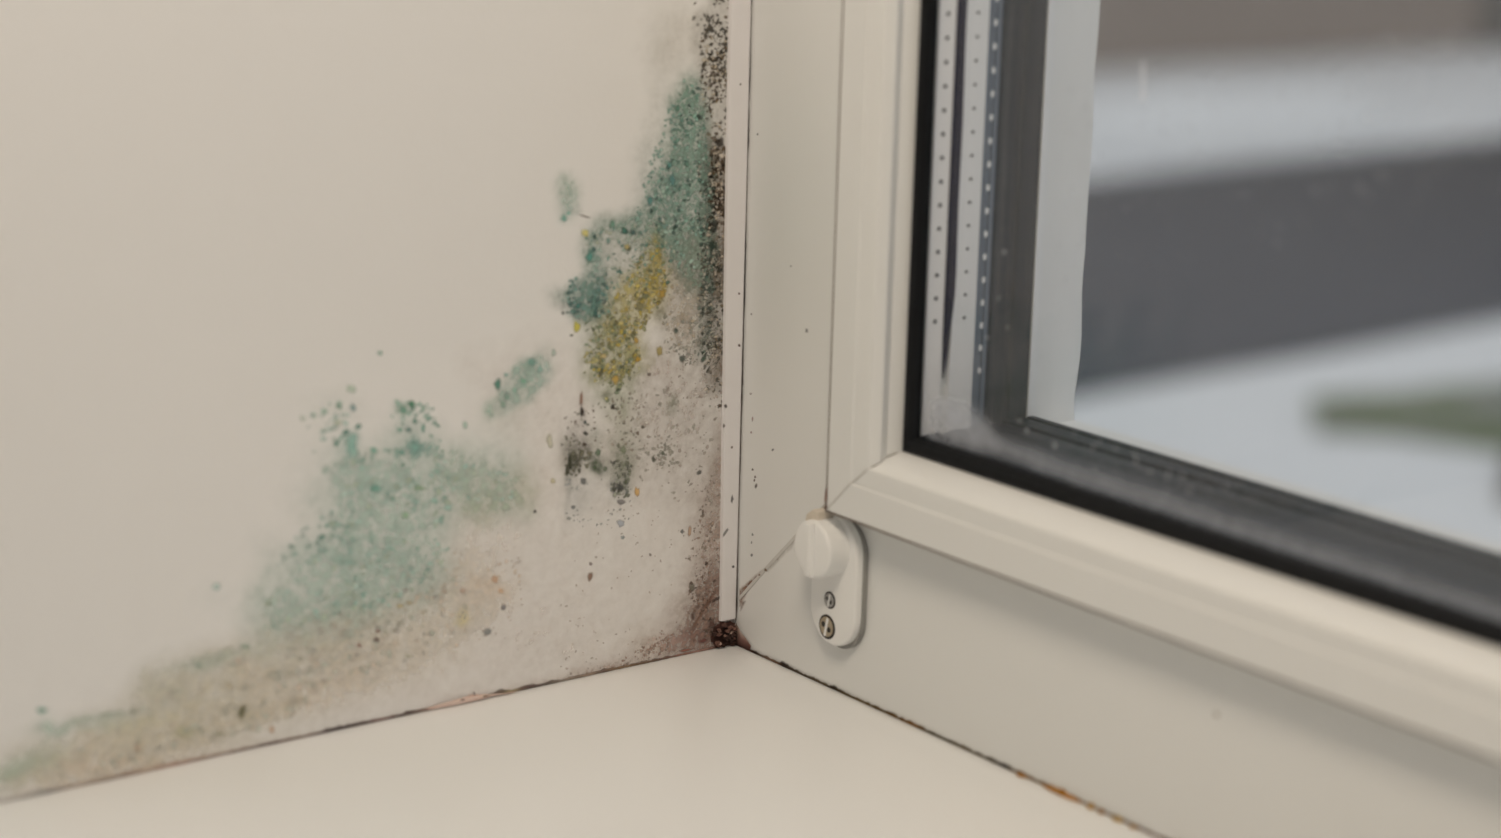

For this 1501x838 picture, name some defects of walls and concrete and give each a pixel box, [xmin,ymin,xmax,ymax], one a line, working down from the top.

damp [488,349,556,414]
damp [547,0,741,674]
damp [0,386,536,784]